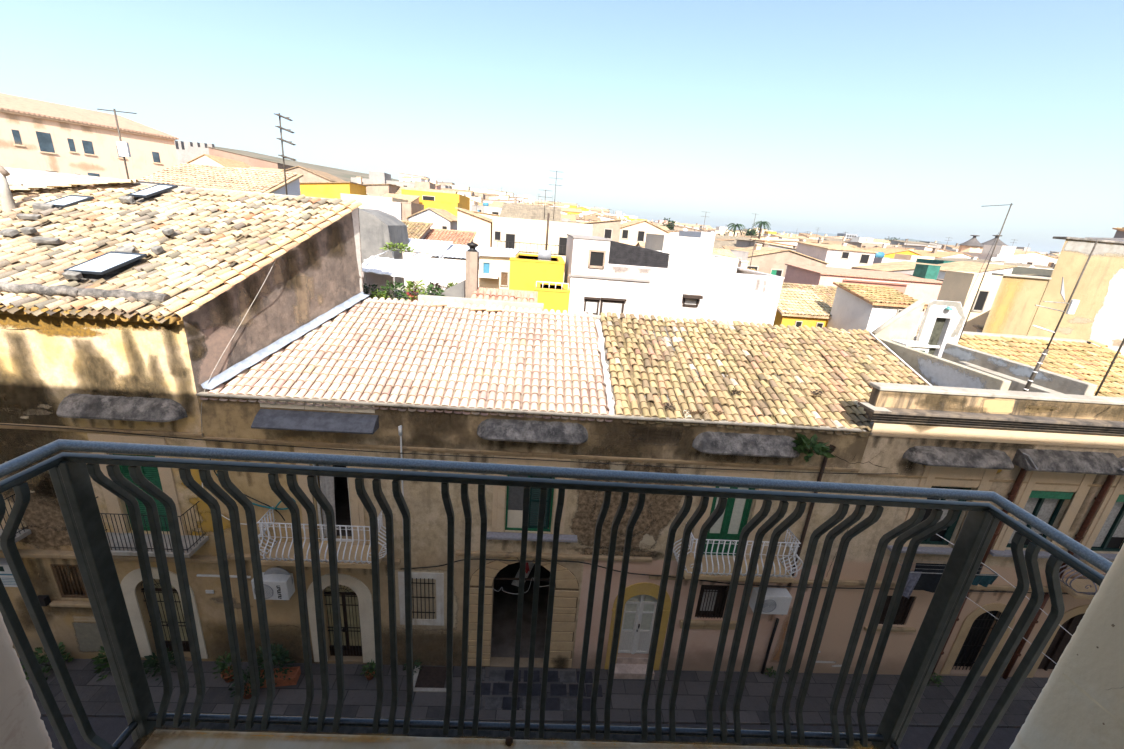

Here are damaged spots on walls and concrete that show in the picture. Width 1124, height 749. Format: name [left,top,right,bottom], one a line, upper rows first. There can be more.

water stain [76,226,343,415]
water stain [0,334,93,618]
flaking render [571,462,684,556]